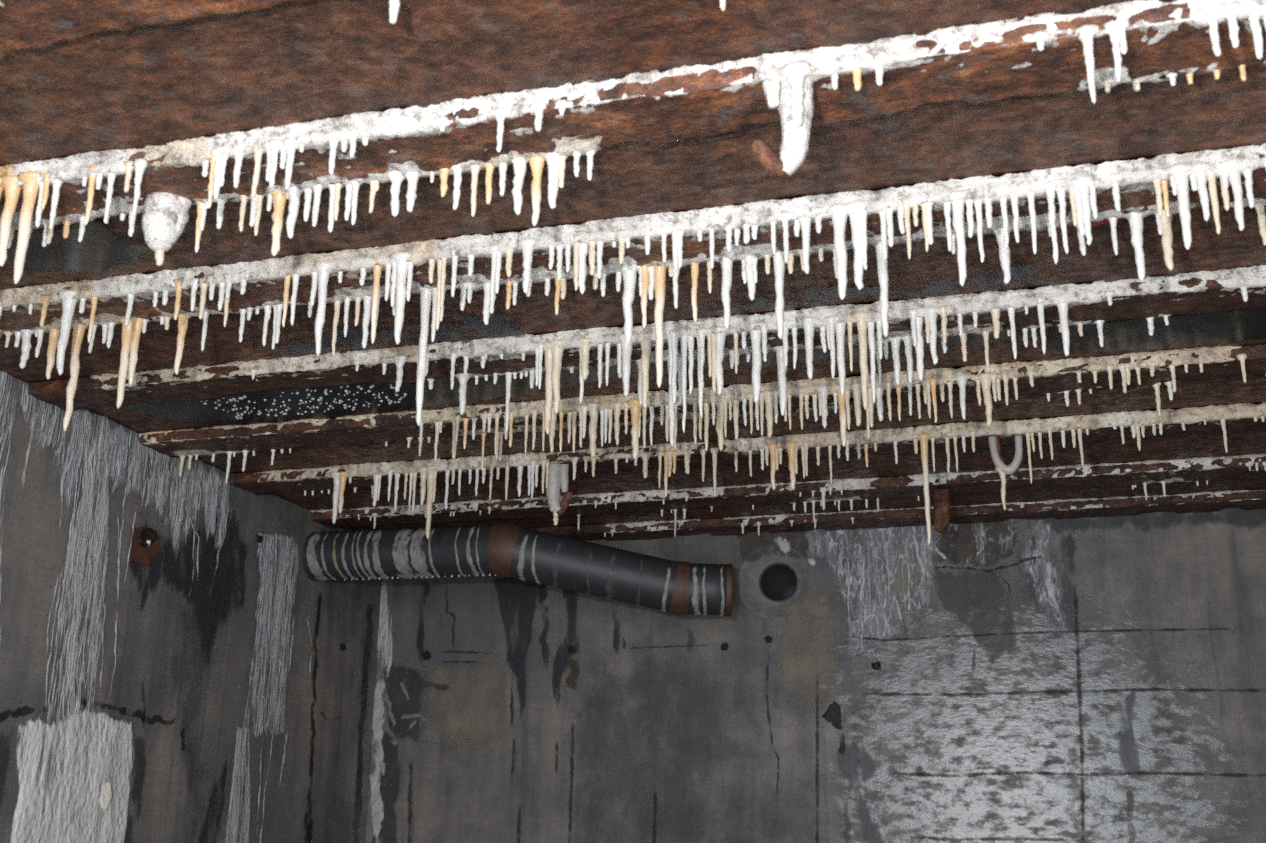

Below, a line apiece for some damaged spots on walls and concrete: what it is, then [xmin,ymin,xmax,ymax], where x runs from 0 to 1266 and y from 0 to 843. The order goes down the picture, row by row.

water stain [0,0,1266,284]
water stain [1146,314,1172,336]
water stain [1236,354,1248,383]
water stain [1046,388,1082,406]
water stain [201,419,329,442]
water stain [1133,477,1248,501]
water stain [970,496,1128,513]
water stain [604,509,694,537]
rust [129,527,160,567]
water stain [351,529,392,676]
water stain [454,526,592,723]
water stain [370,681,385,843]